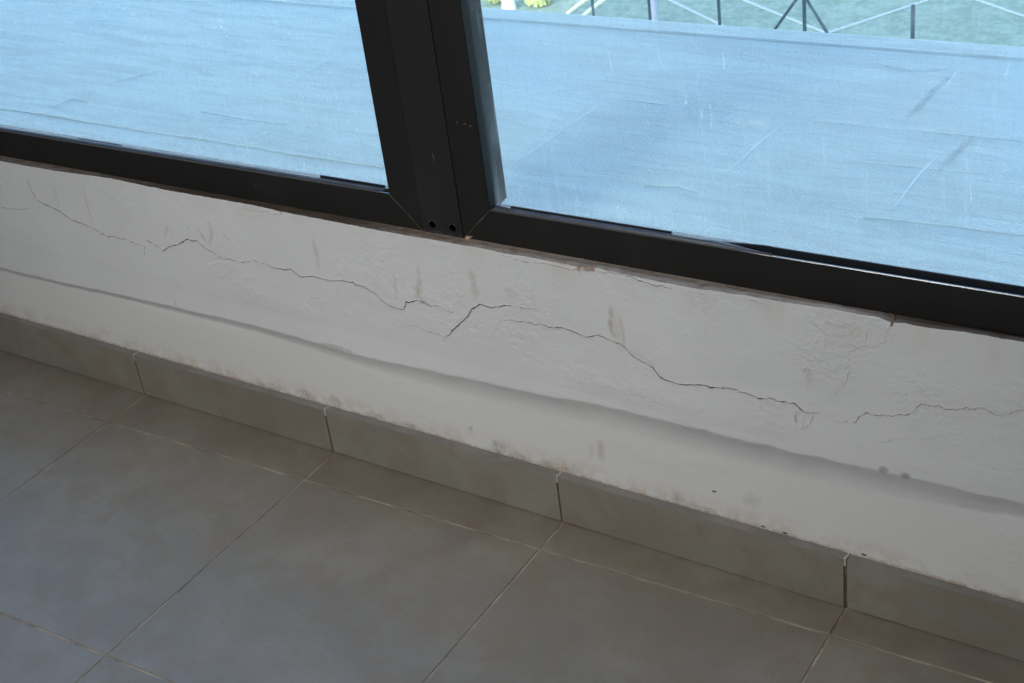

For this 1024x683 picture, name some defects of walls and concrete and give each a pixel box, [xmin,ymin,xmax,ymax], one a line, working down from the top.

crack [1,198,1024,424]